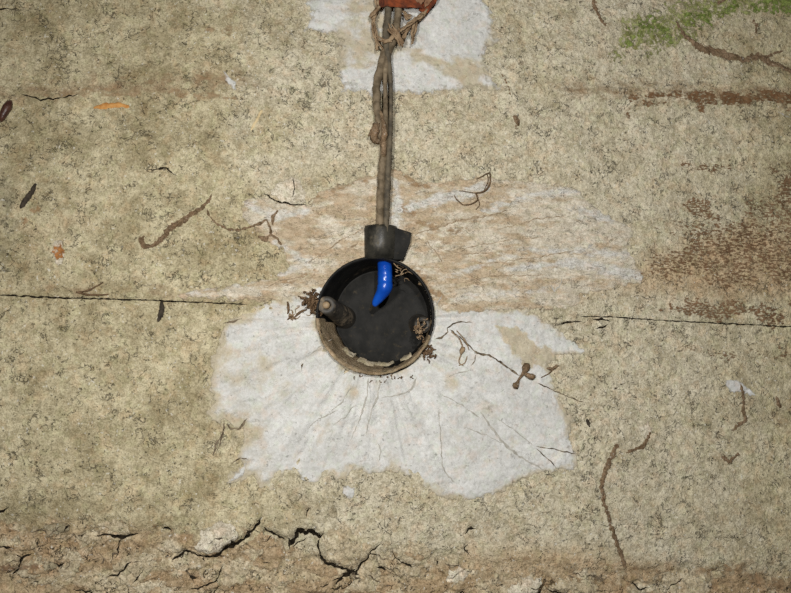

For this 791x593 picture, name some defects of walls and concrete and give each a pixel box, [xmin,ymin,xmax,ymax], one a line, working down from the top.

crack [1,294,244,305]
crack [561,316,791,329]
crack [0,546,32,574]
crack [74,533,144,593]
crack [173,508,414,593]